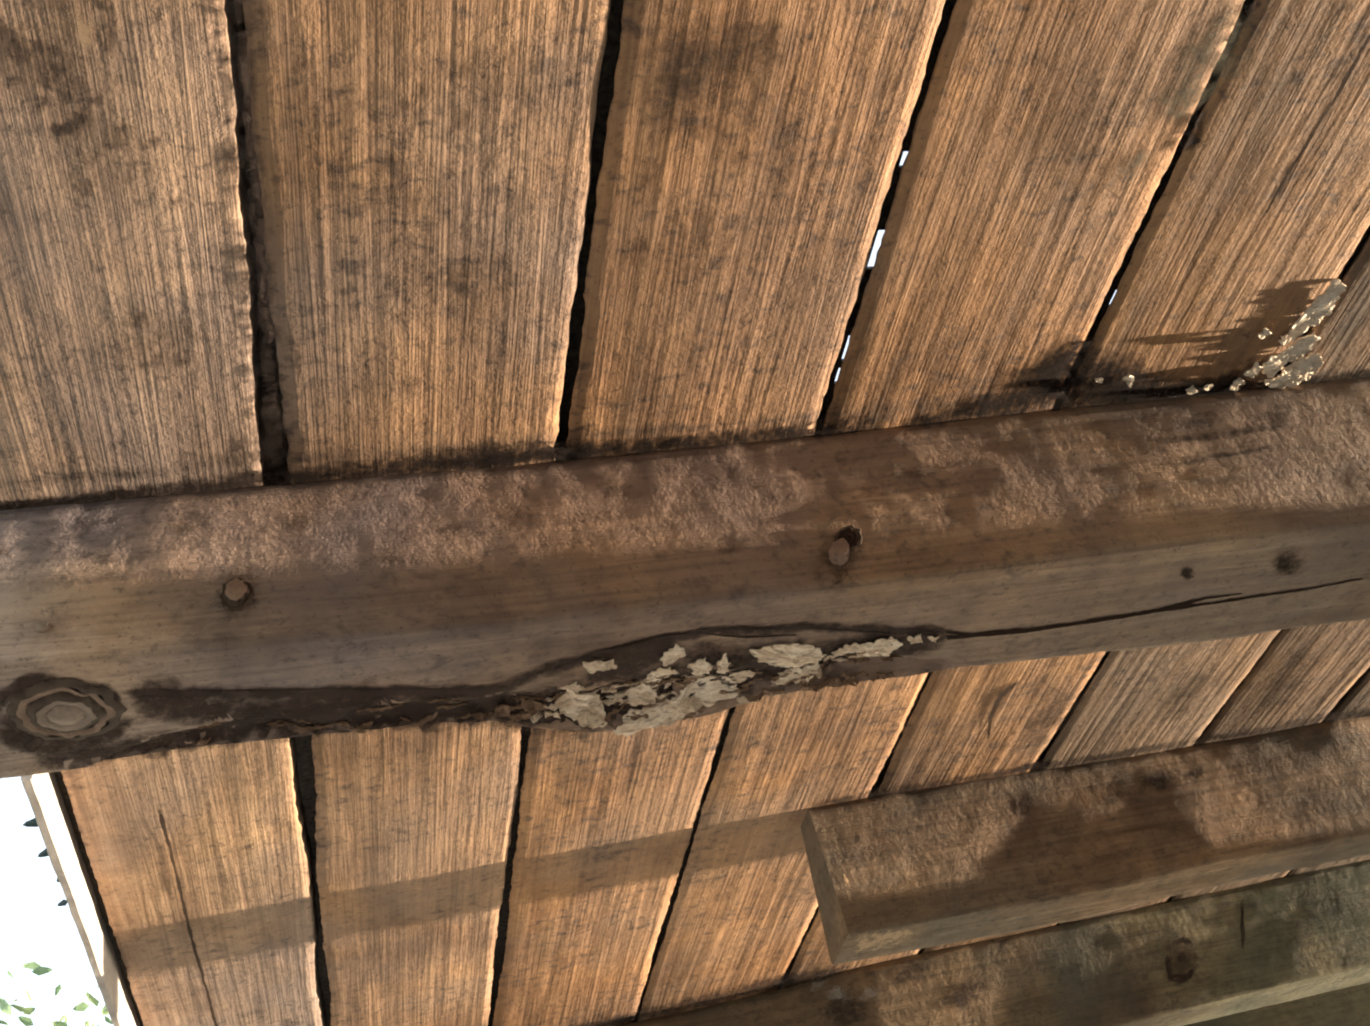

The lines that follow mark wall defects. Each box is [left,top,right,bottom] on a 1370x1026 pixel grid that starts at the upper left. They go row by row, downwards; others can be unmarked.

crack [1264,35,1370,215]
damp [0,0,873,511]
damp [910,339,1269,426]
damp [1298,371,1370,385]
damp [1162,404,1285,464]
crack [873,578,1363,640]
peeling [495,659,617,729]
crack [555,626,840,670]
peeling [624,634,939,707]
crack [157,809,218,1026]